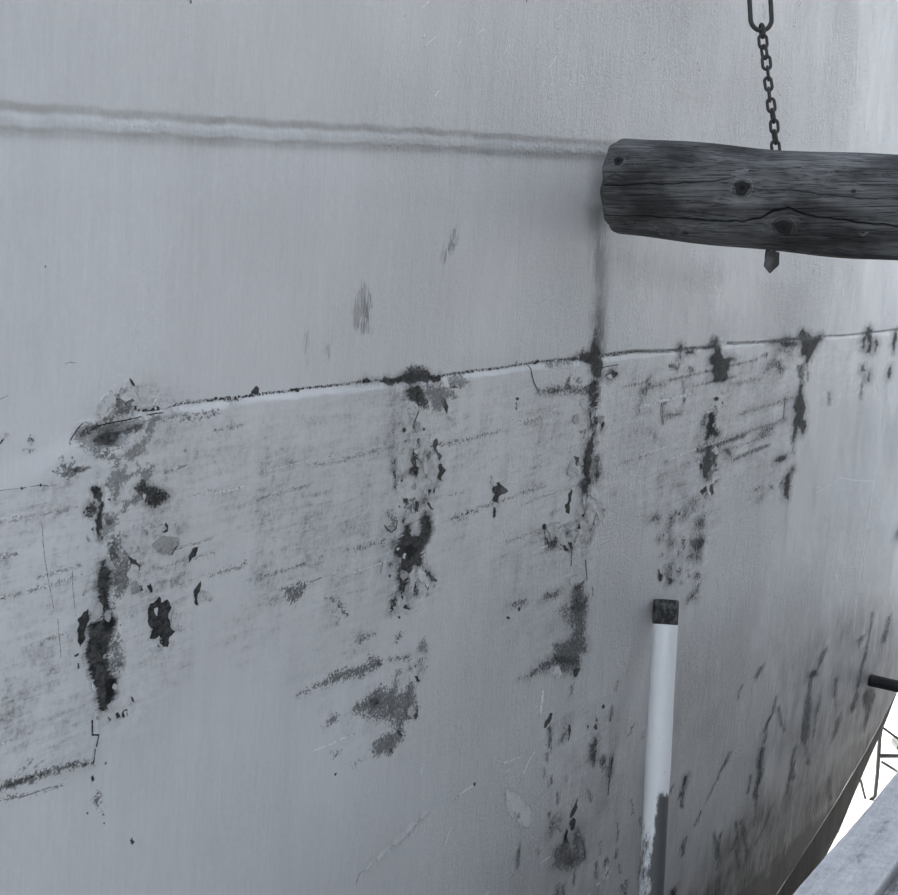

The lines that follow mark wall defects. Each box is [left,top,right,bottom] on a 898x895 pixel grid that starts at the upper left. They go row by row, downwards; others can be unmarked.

peeling [95,378,202,423]
damp [625,353,787,464]
peeling [390,421,446,514]
peeling [490,475,508,518]
peeling [142,522,180,556]
damp [558,582,587,620]
peeling [74,609,90,669]
peeling [148,597,182,658]
damp [519,643,580,680]
peeling [107,696,135,721]
damp [370,730,406,758]